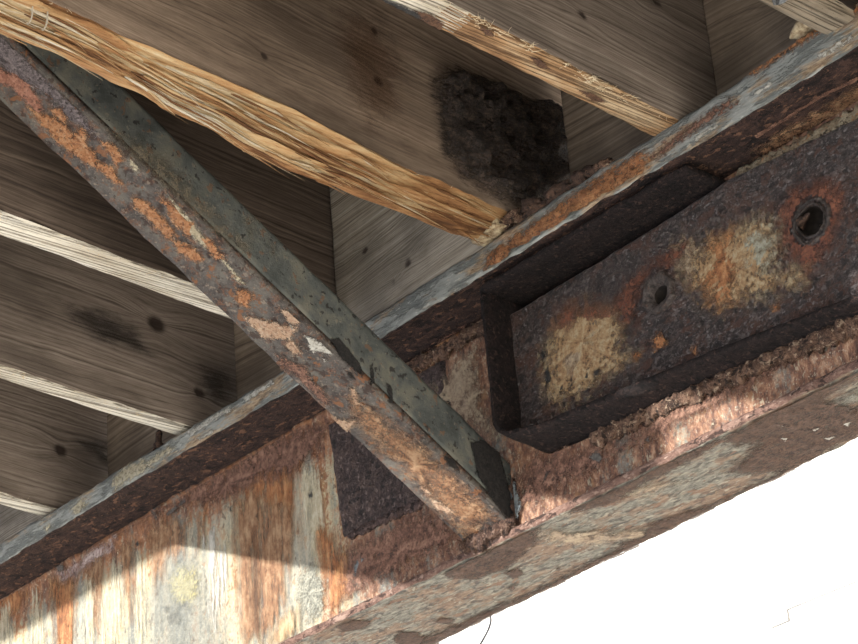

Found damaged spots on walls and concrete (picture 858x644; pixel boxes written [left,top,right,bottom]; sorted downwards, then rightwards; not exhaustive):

rust [651,98,739,159]
rust [613,180,844,326]
rust [275,354,332,409]
peeling [542,301,629,403]
rust [653,332,668,353]
rust [115,422,328,644]
rust [316,401,489,610]
rust [393,351,858,644]
rust [0,591,28,626]
rust [49,577,77,644]
rust [86,556,102,626]
rust [336,620,373,632]